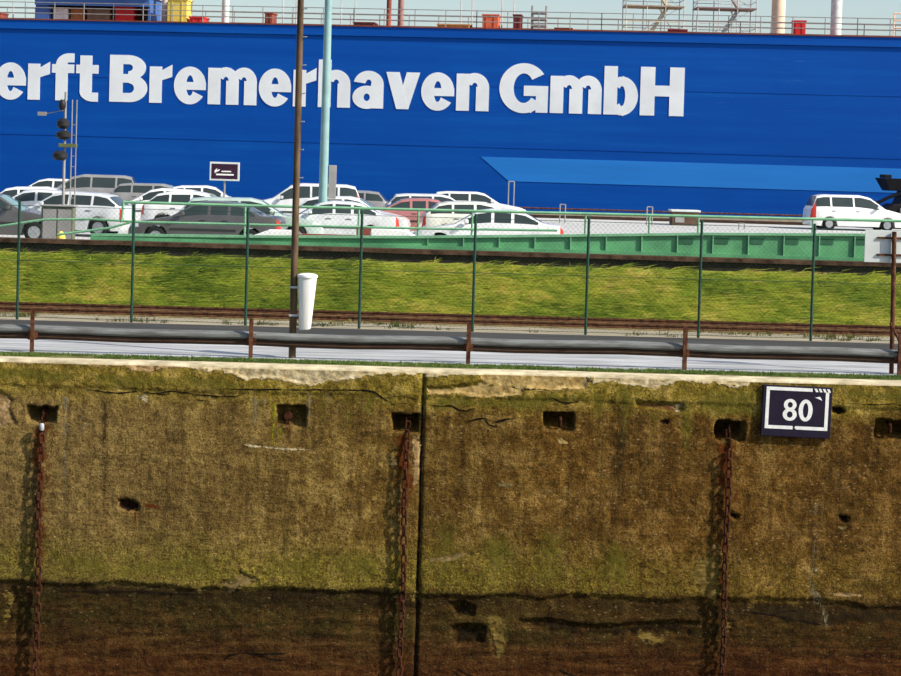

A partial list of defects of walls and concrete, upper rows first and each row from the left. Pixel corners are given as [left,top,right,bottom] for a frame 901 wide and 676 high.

spalling [0,395,14,426]
crack [79,383,515,427]
rust [33,422,55,560]
water stain [54,583,393,599]